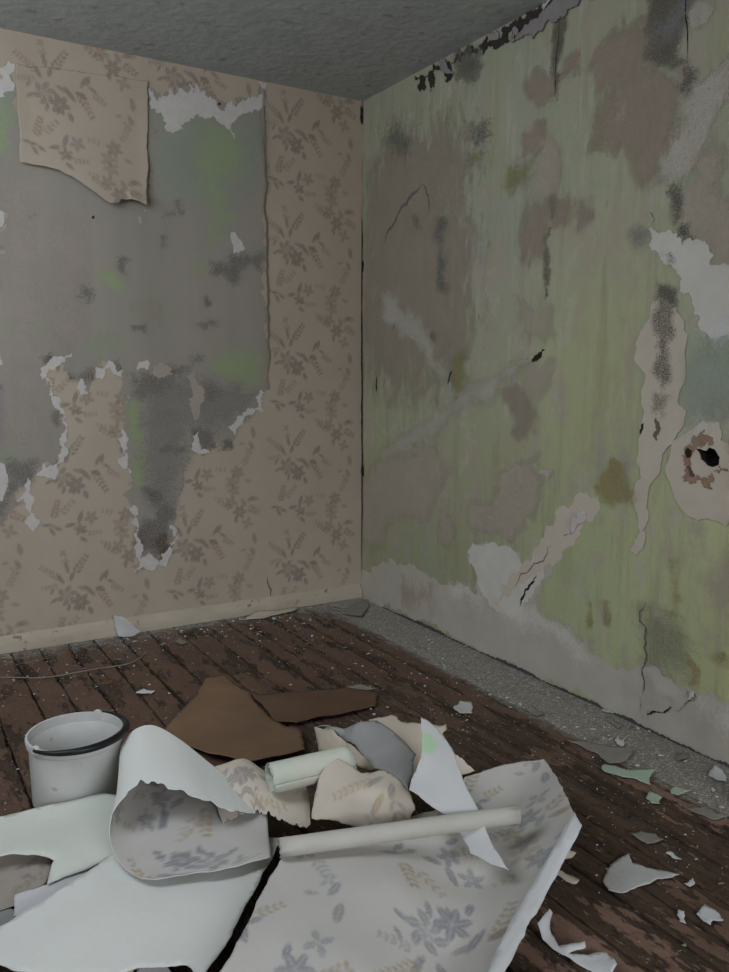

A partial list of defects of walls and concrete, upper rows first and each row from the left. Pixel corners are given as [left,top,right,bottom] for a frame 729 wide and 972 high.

spalling [414,0,581,91]
leakage [549,18,569,101]
leakage [641,0,700,106]
peeling [16,63,149,205]
leakage [541,193,559,298]
crack [361,184,430,580]
peeling [624,211,729,555]
leakage [110,353,265,560]
crack [494,492,600,608]
spalling [360,541,729,764]